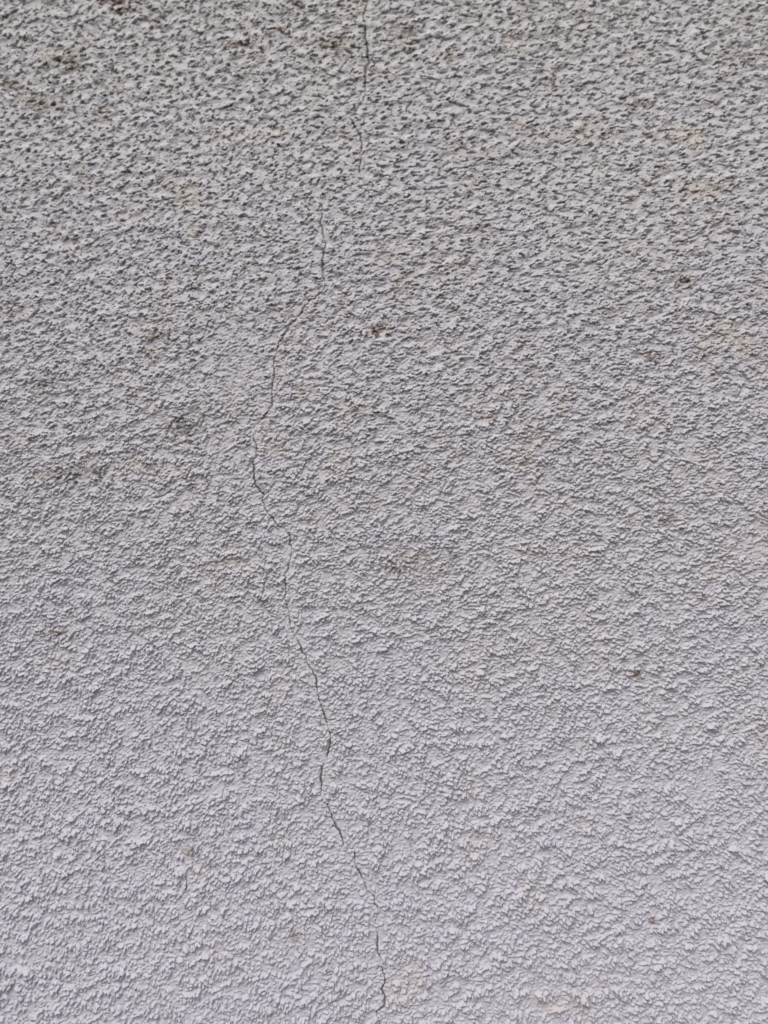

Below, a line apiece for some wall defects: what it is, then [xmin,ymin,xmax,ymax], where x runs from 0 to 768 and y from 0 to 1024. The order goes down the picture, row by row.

crack [342,0,370,191]
crack [222,213,386,1024]